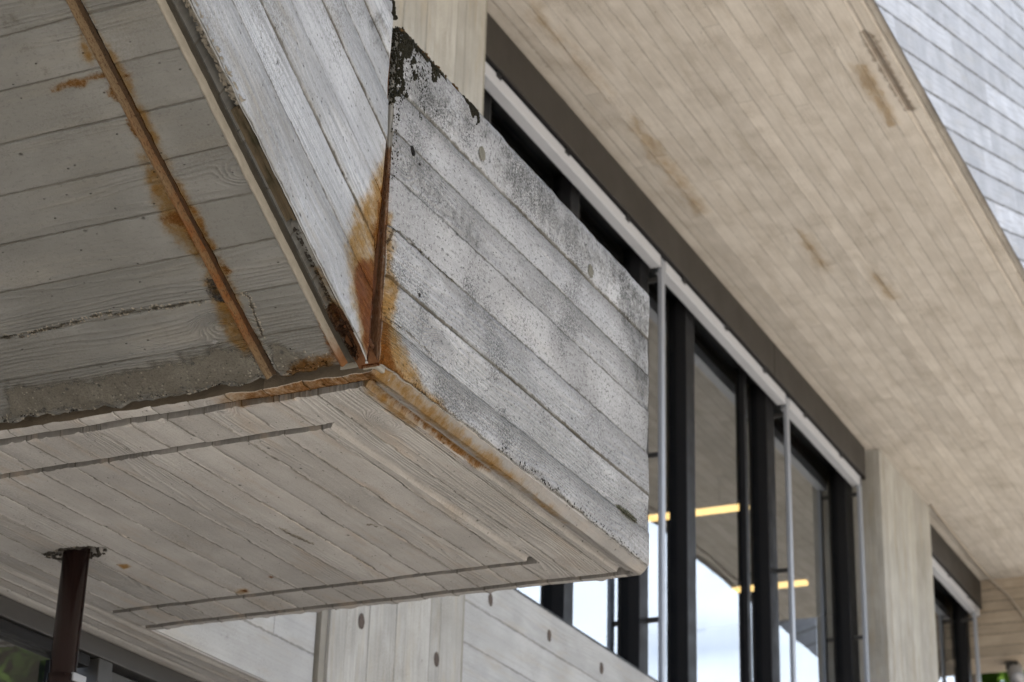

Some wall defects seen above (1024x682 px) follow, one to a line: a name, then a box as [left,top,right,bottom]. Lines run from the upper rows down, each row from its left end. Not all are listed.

spalling [183,0,246,105]
crack [3,300,206,339]
spalling [293,227,380,369]
corrosion [356,148,400,375]
spalling [0,343,328,423]